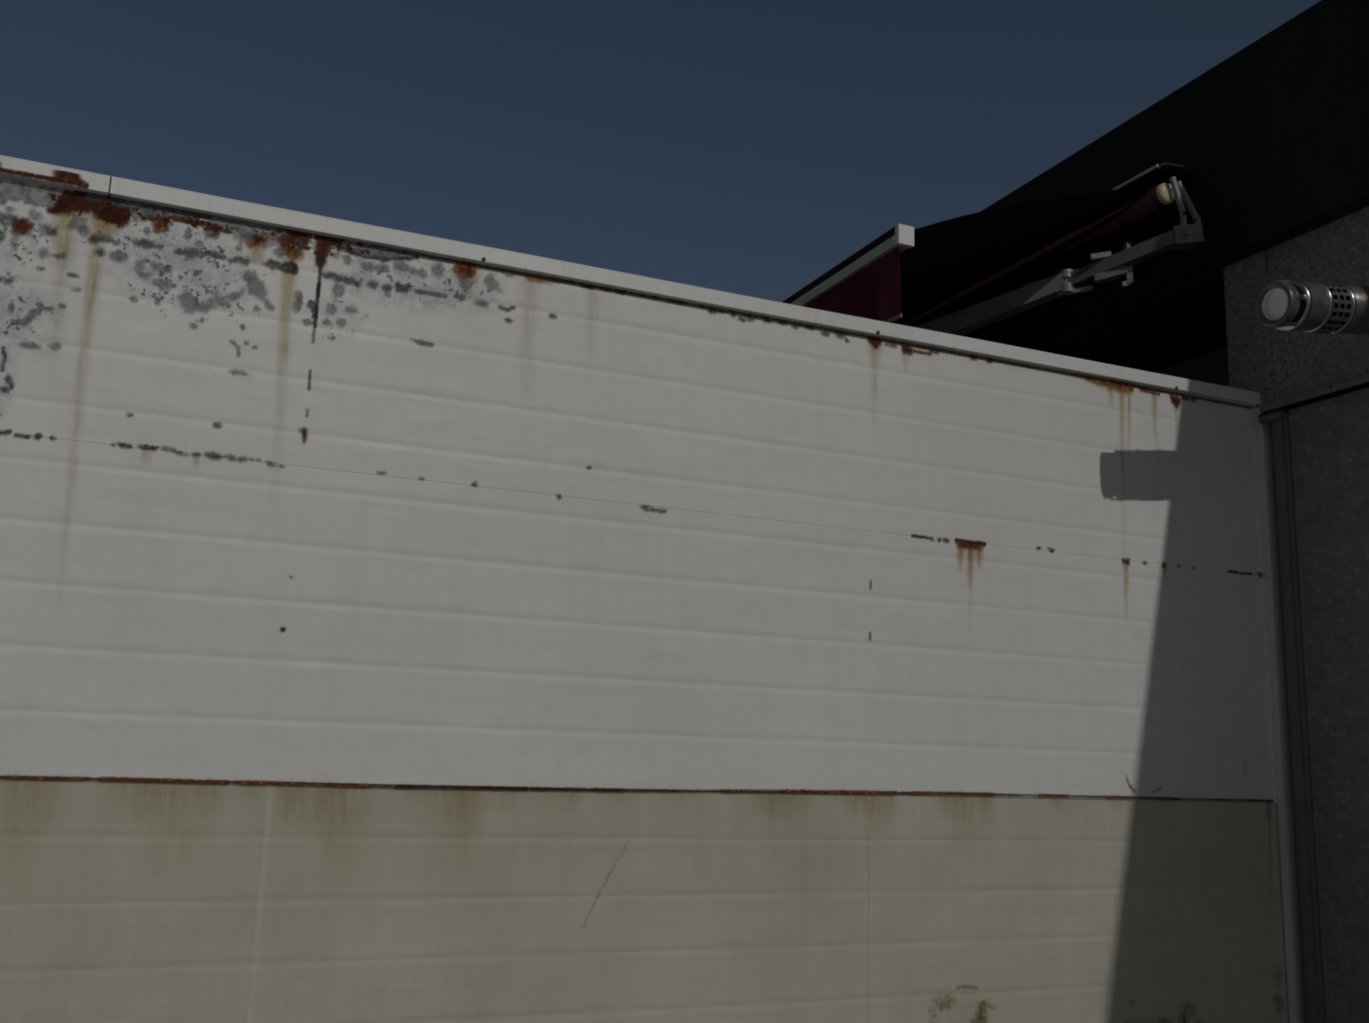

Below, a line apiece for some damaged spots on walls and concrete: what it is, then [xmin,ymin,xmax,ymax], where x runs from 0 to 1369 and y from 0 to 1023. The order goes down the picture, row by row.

peeling [0,182,301,392]
peeling [294,238,515,340]
peeling [0,430,54,440]
peeling [112,442,283,467]